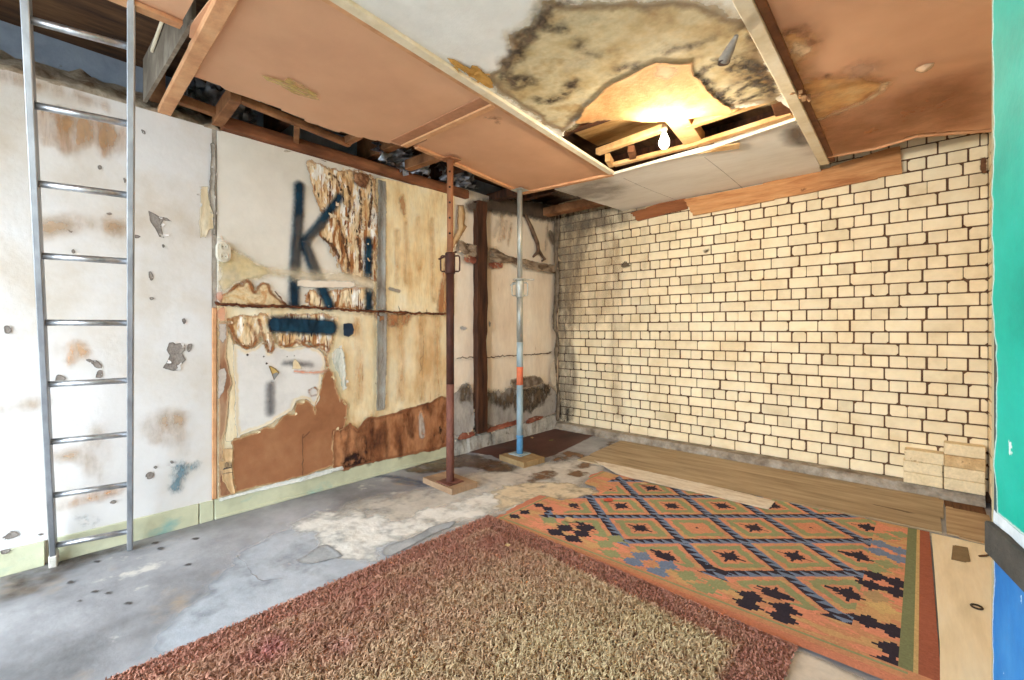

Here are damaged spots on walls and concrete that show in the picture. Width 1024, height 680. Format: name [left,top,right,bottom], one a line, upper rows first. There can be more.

water stain [488,0,781,132]
peeling [575,62,732,124]
water stain [781,29,975,149]
peeling [148,211,170,248]
peeling [286,160,556,320]
peeling [163,342,192,371]
peeling [218,313,349,502]
water stain [332,335,513,486]
water stain [466,198,645,422]